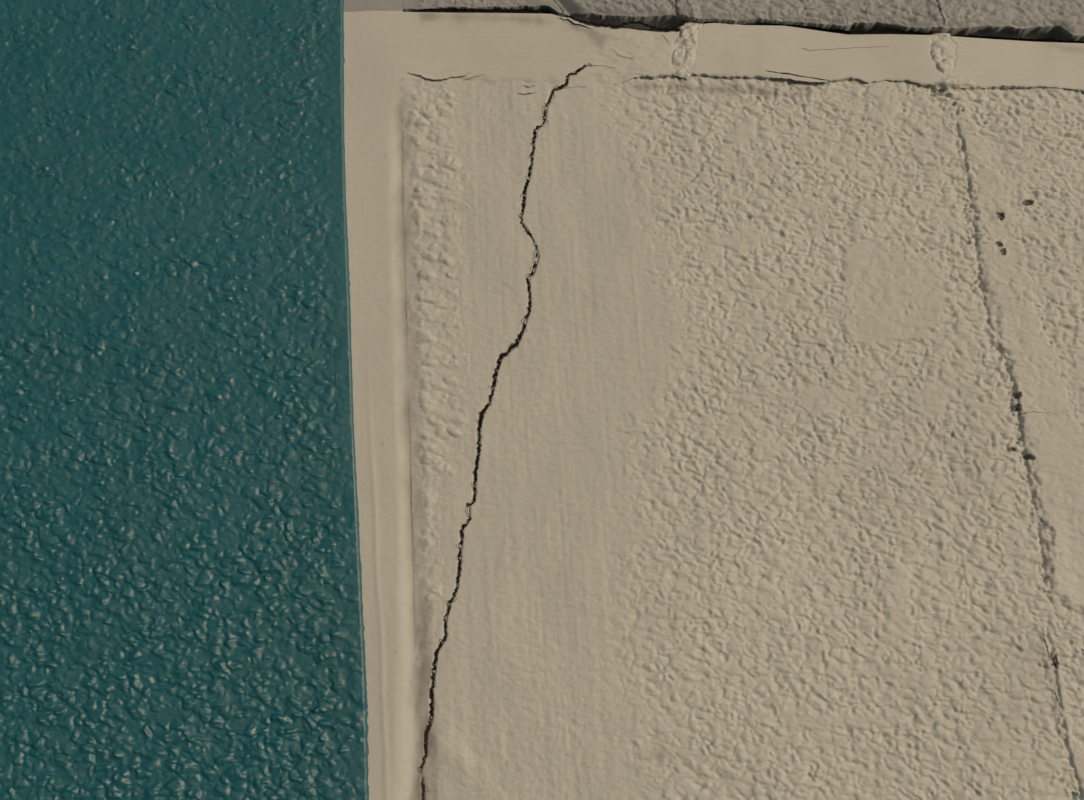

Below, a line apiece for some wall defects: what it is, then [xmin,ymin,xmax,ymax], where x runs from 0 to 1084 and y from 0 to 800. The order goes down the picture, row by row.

crack [554,0,681,40]
crack [417,54,633,800]